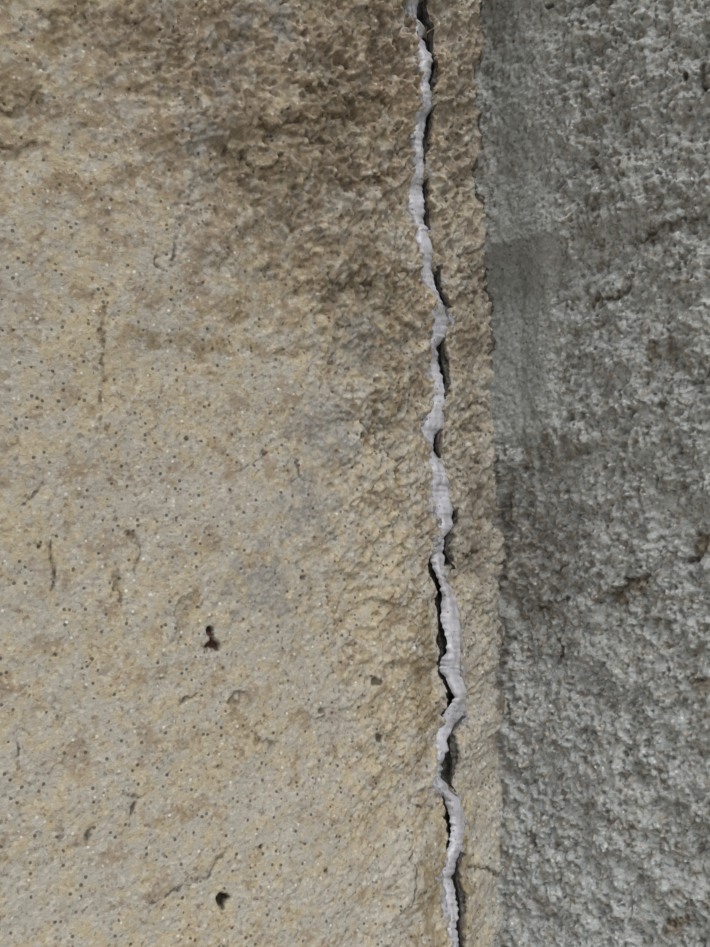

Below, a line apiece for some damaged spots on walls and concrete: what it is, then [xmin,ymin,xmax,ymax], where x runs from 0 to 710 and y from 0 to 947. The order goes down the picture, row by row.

crack [411,0,438,230]
crack [471,160,485,209]
crack [422,232,496,465]
crack [416,507,499,947]